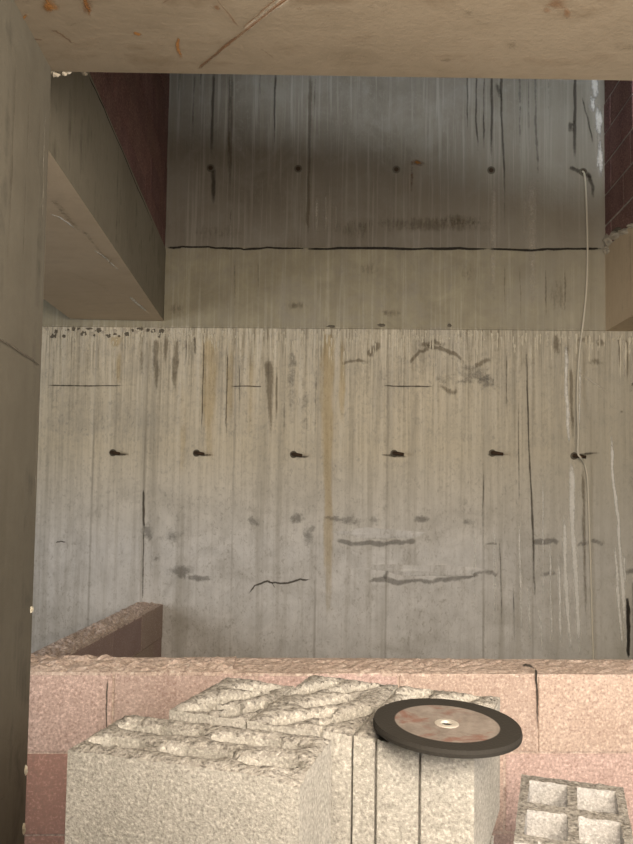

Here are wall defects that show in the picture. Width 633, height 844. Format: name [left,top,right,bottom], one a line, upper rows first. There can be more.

crack [201,22,256,67]
damp [47,327,633,560]
crack [250,578,308,592]
damp [513,466,581,644]
damp [611,442,626,642]